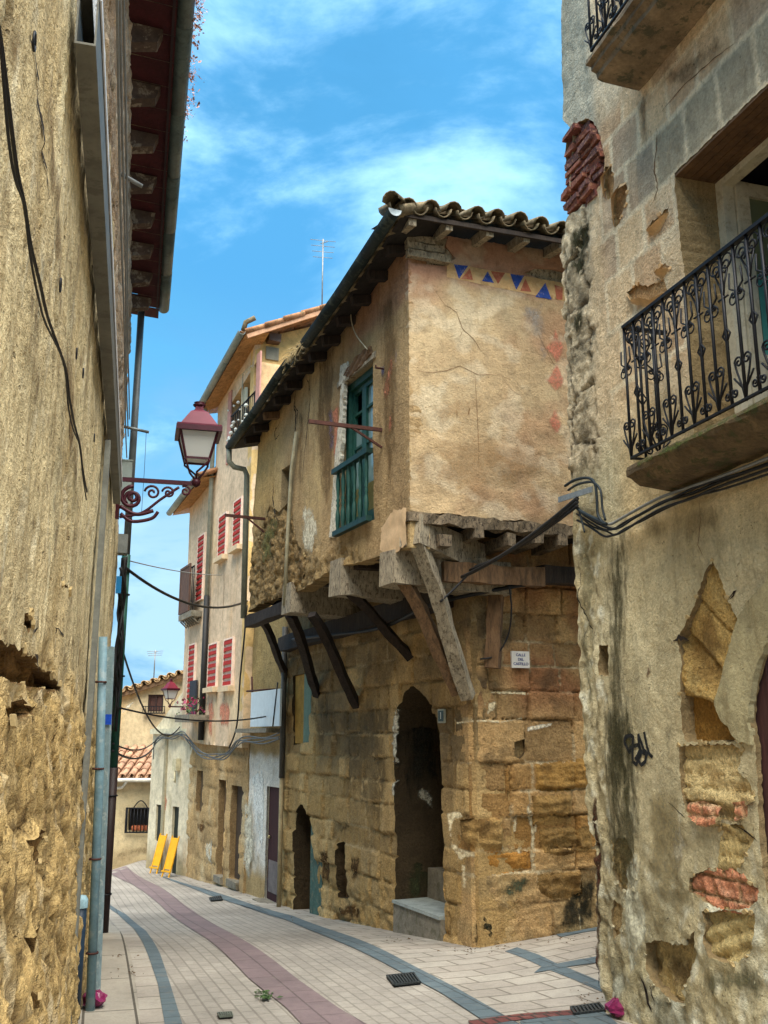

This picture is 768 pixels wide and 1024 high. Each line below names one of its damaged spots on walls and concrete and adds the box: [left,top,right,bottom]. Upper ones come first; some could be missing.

flaking render [561,120,629,228]
peeling [646,209,669,238]
crack [652,45,732,203]
peeling [626,262,672,307]
flaking render [249,505,307,605]
hole [0,642,62,728]
water stain [606,543,646,969]
flaking render [643,558,759,1006]